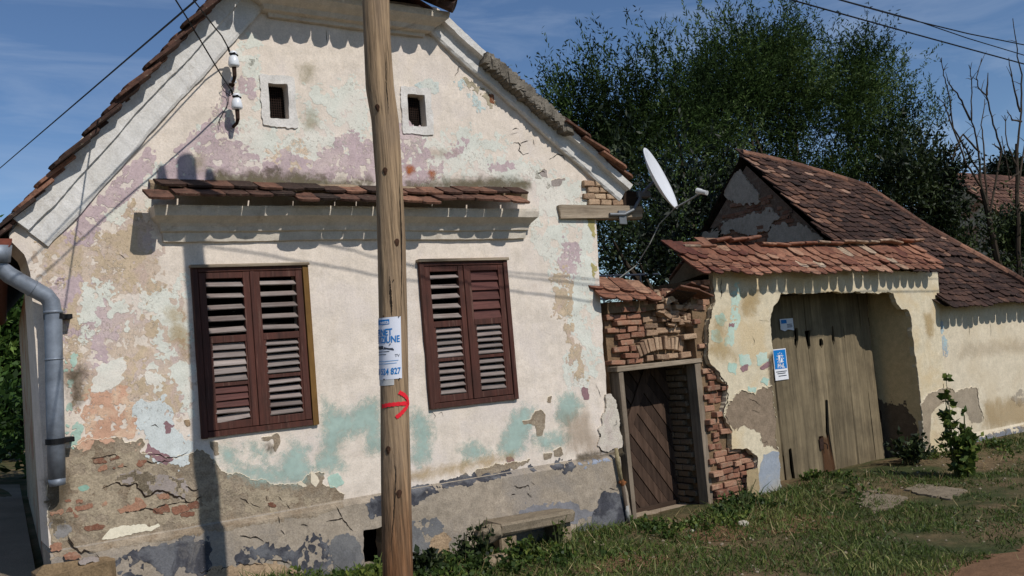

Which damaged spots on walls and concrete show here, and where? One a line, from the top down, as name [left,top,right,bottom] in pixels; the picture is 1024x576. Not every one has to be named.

peeling [702,169,824,243]
peeling [30,32,381,576]
peeling [399,76,611,506]
damp [68,369,82,403]
spalling [711,282,782,494]
spalling [878,387,983,457]
crack [93,450,200,515]
crack [200,496,352,573]
peeling [412,517,452,559]
peeling [519,491,627,532]